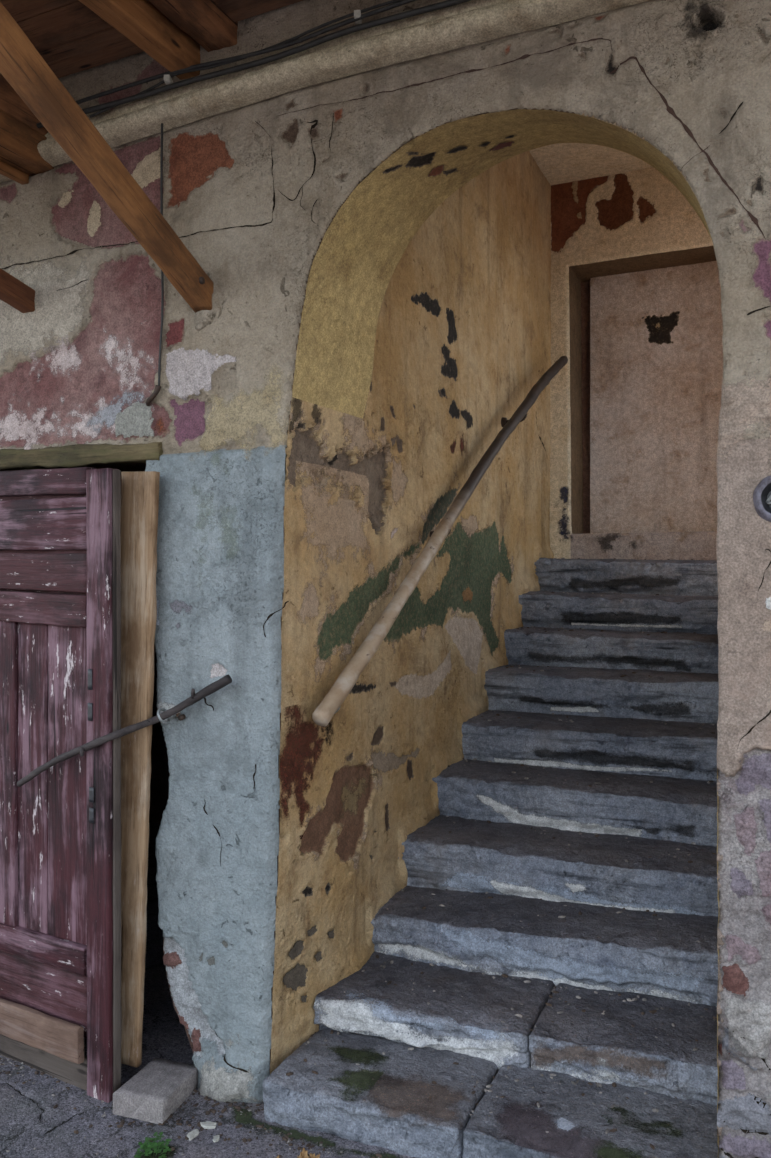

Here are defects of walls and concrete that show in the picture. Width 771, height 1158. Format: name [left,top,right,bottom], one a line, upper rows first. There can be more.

crack [1,241,138,269]
peeling [0,161,237,450]
peeling [114,131,235,212]
peeling [411,292,473,430]
crack [179,38,765,238]
peeling [551,173,657,253]
spalling [287,405,408,539]
peeling [309,473,514,682]
spalling [299,726,420,869]
spalling [162,938,249,1073]
spalling [283,925,334,1003]
spalling [717,749,771,1158]